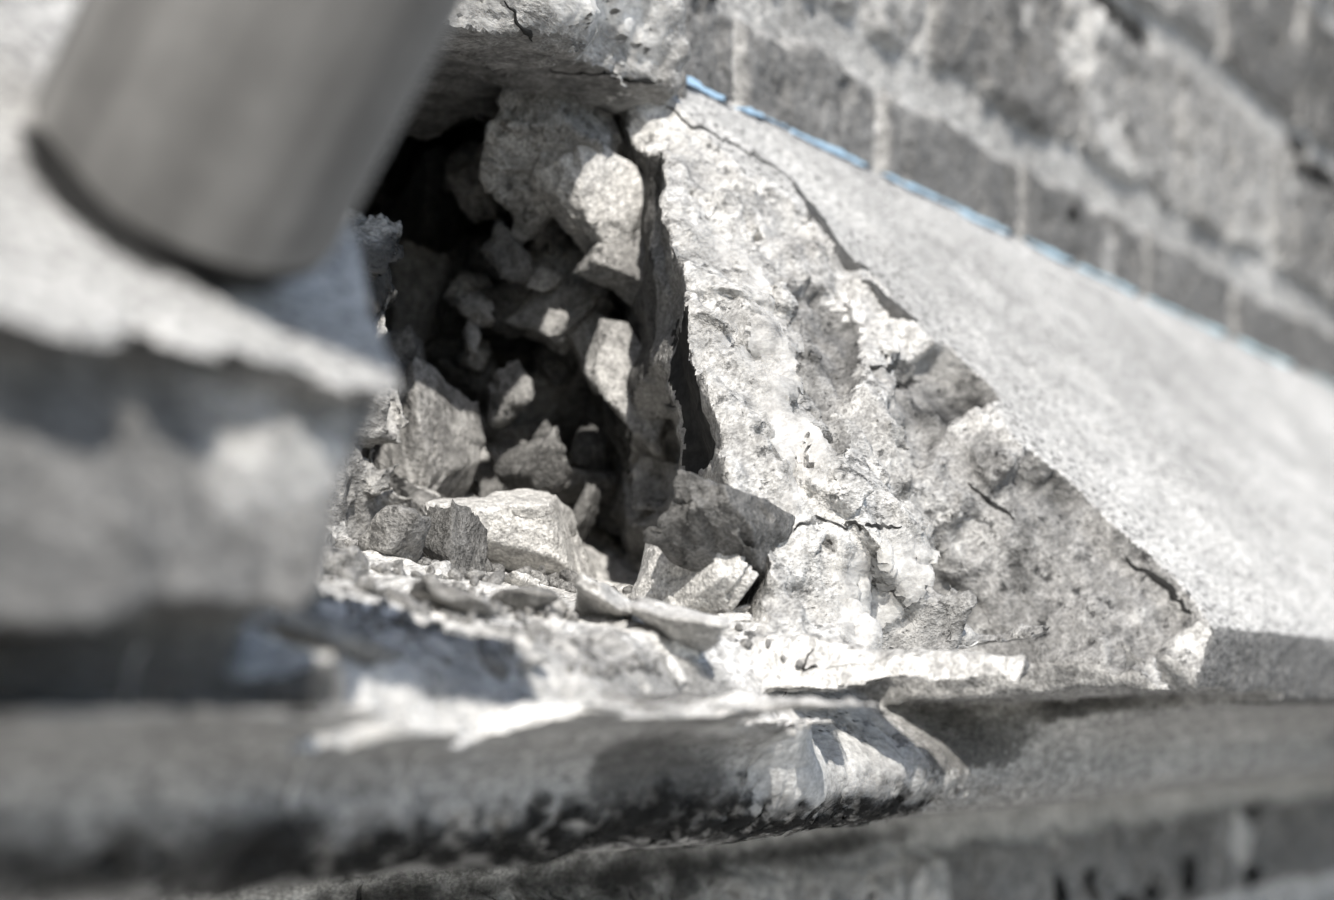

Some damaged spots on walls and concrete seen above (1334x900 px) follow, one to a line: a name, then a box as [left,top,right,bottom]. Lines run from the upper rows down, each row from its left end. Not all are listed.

crack [504,1,533,42]
spalling [1105,2,1146,50]
crack [549,69,918,322]
spalling [0,99,1212,754]